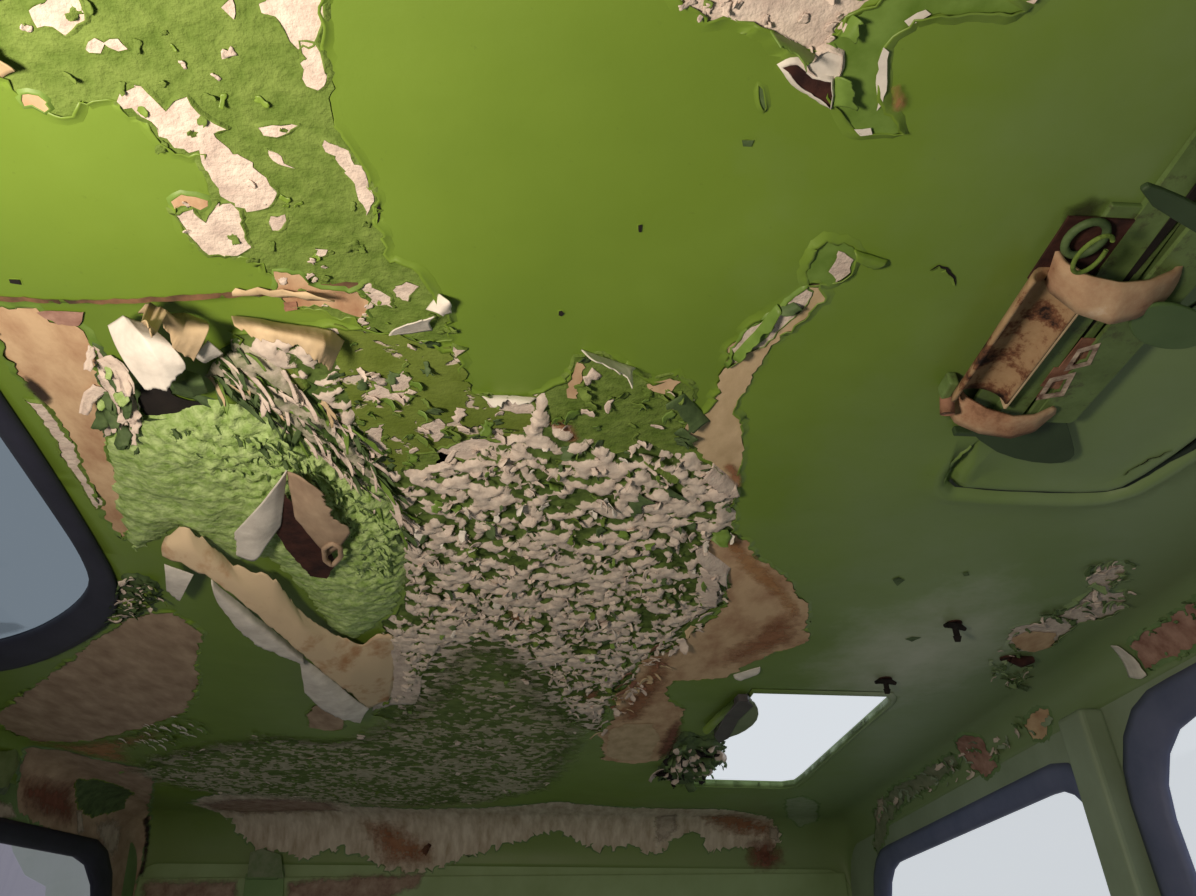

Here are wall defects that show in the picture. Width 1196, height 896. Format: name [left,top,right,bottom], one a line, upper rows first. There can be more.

peeling [664,0,1049,140]
rust [1000,314,1101,409]
peeling [0,0,889,896]
peeling [989,561,1137,692]
peeling [872,705,1054,855]